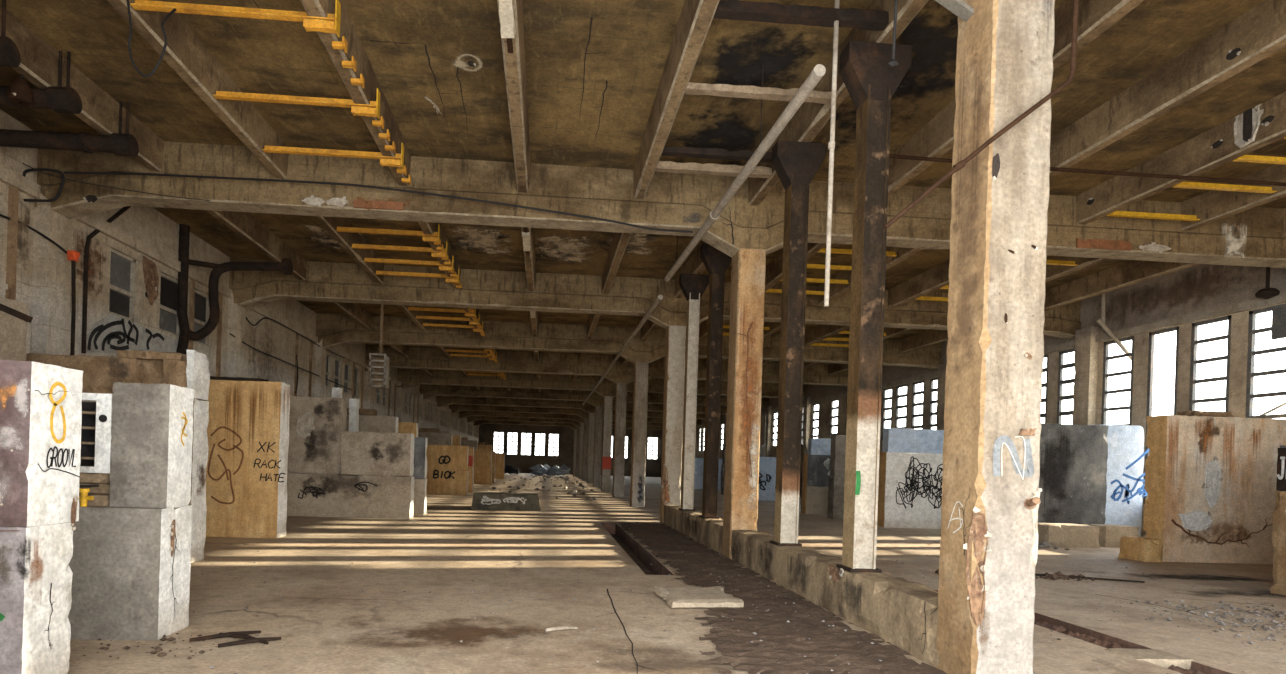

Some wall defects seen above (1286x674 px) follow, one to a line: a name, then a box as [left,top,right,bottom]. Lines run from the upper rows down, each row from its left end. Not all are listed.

water stain [717,39,806,85]
peeling [14,381,30,416]
peeling [0,427,21,452]
water stain [1044,435,1068,500]
spalling [963,507,992,626]